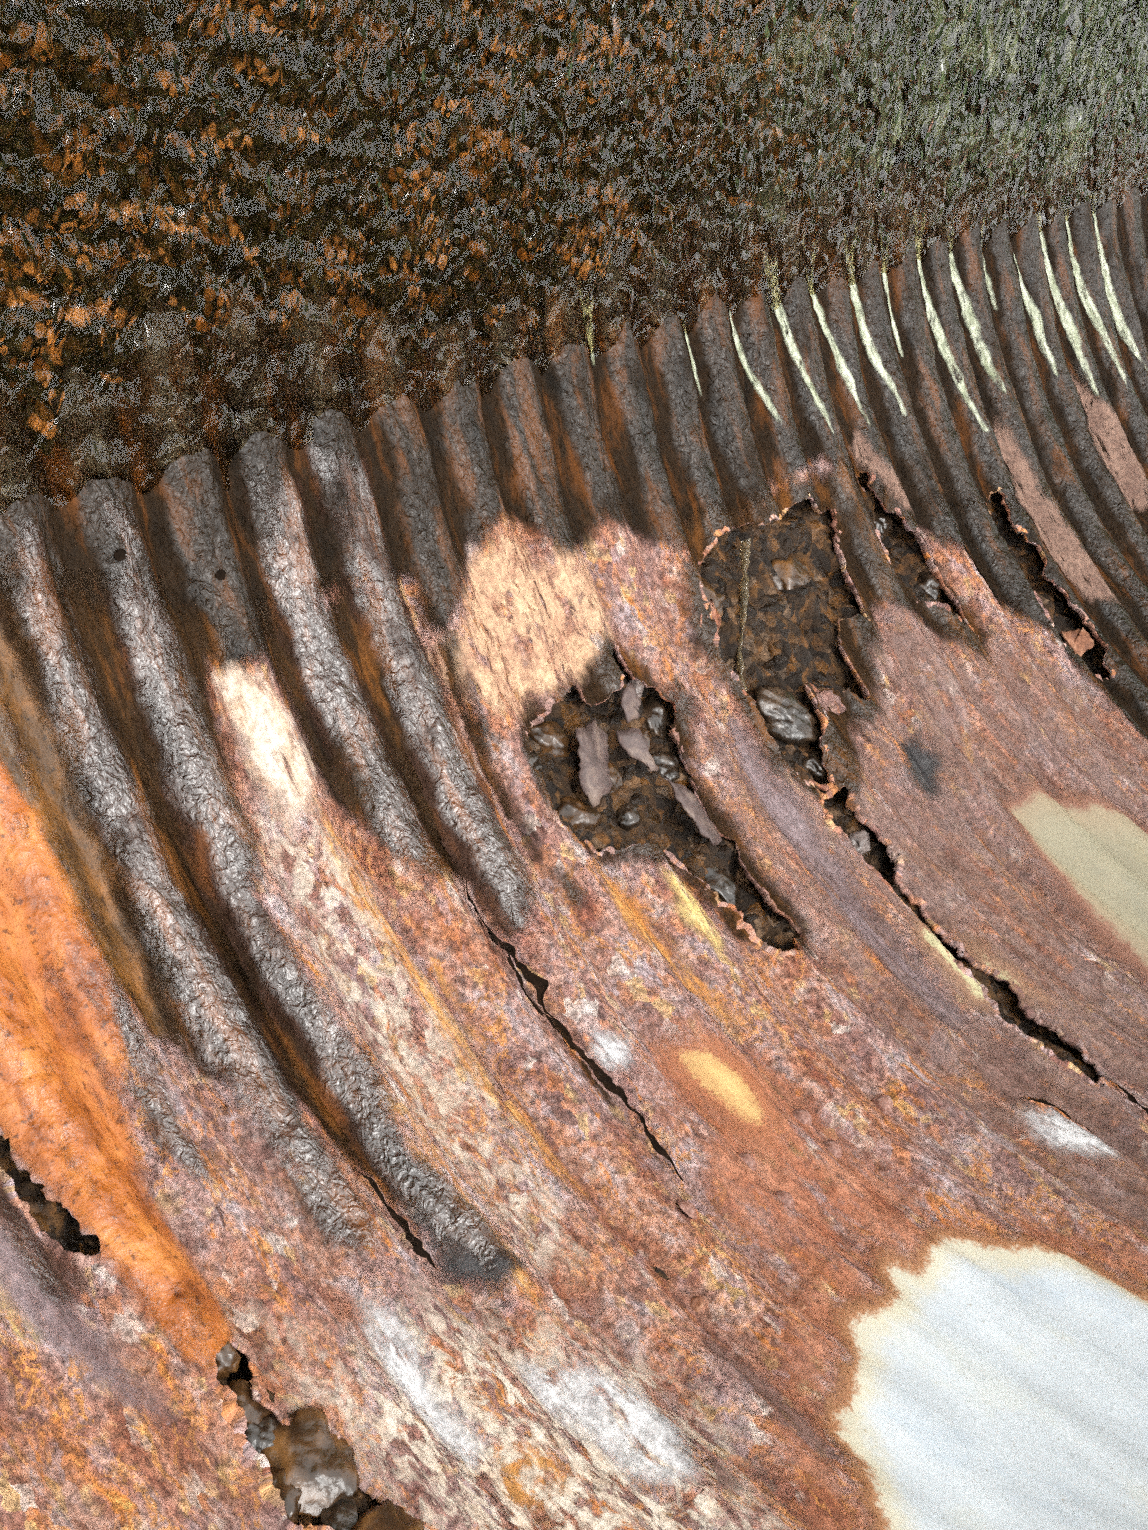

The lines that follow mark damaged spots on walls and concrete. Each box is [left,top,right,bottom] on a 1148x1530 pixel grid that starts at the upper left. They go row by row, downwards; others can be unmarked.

corrosion [853,431,914,514]
corrosion [994,425,1117,601]
corrosion [1071,375,1148,510]
peeling [700,599,721,635]
corrosion [217,670,312,810]
peeling [575,682,723,846]
peeling [814,690,847,720]
crack [459,870,683,1182]
crack [1029,1098,1094,1135]
crack [1105,1077,1148,1124]
corrosion [603,874,964,1530]
corrosion [499,1451,560,1503]